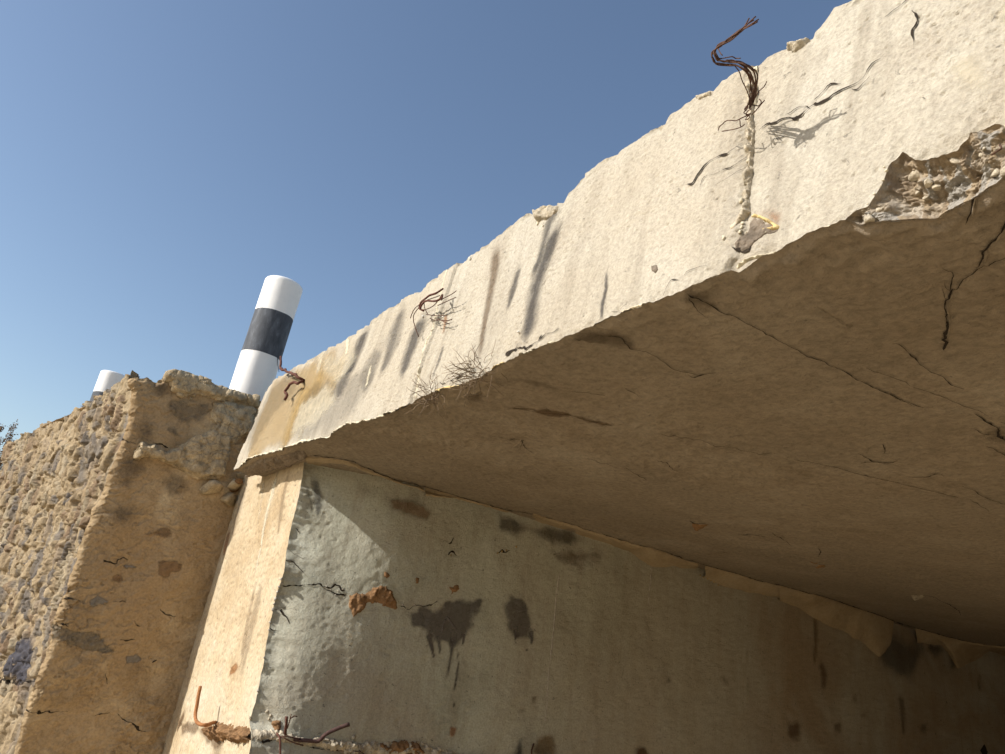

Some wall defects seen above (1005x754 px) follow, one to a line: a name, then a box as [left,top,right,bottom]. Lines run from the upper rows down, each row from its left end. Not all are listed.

crack [687,59,878,185]
spalling [845,124,1005,226]
crack [966,186,992,223]
water stain [525,232,557,335]
crack [942,223,1005,350]
water stain [345,334,366,372]
water stain [402,323,422,372]
crack [662,265,1005,456]
crack [283,528,345,596]
water stain [412,599,482,689]
water stain [506,598,533,651]